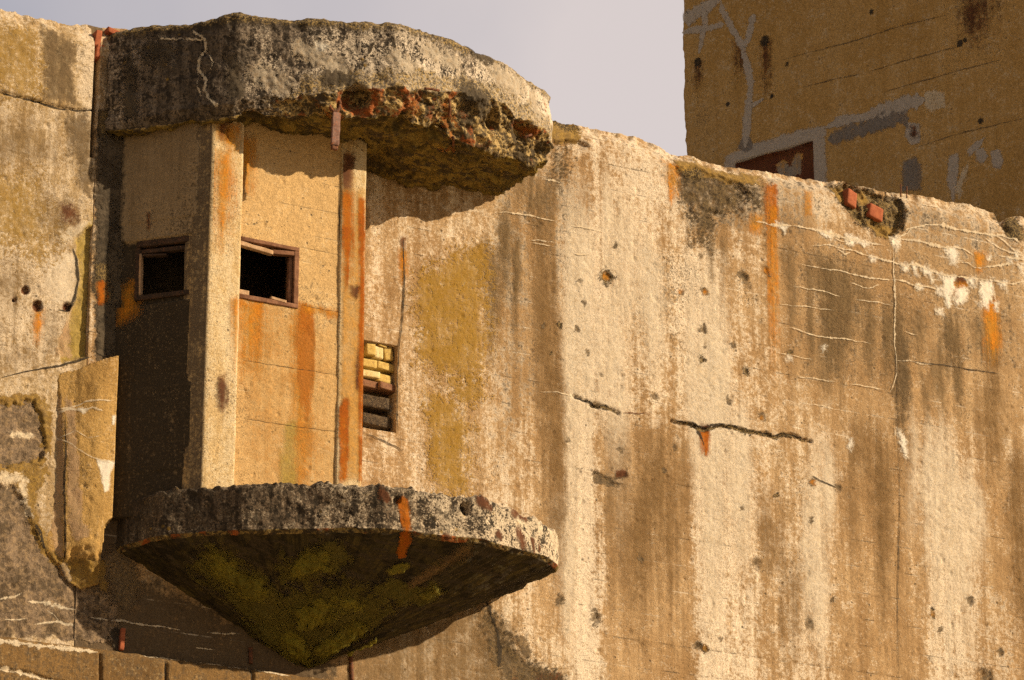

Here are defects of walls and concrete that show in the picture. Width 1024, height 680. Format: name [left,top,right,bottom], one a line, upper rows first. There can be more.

corrosion [214,122,256,234]
spalling [824,181,909,239]
corrosion [292,153,366,485]
corrosion [954,275,968,297]
corrosion [217,378,229,411]
water stain [533,179,663,620]
crack [556,391,809,446]
water stain [633,280,775,582]
water stain [667,159,1024,649]
corrosion [379,489,412,559]
corrosion [476,495,492,511]
corrosion [512,509,541,553]